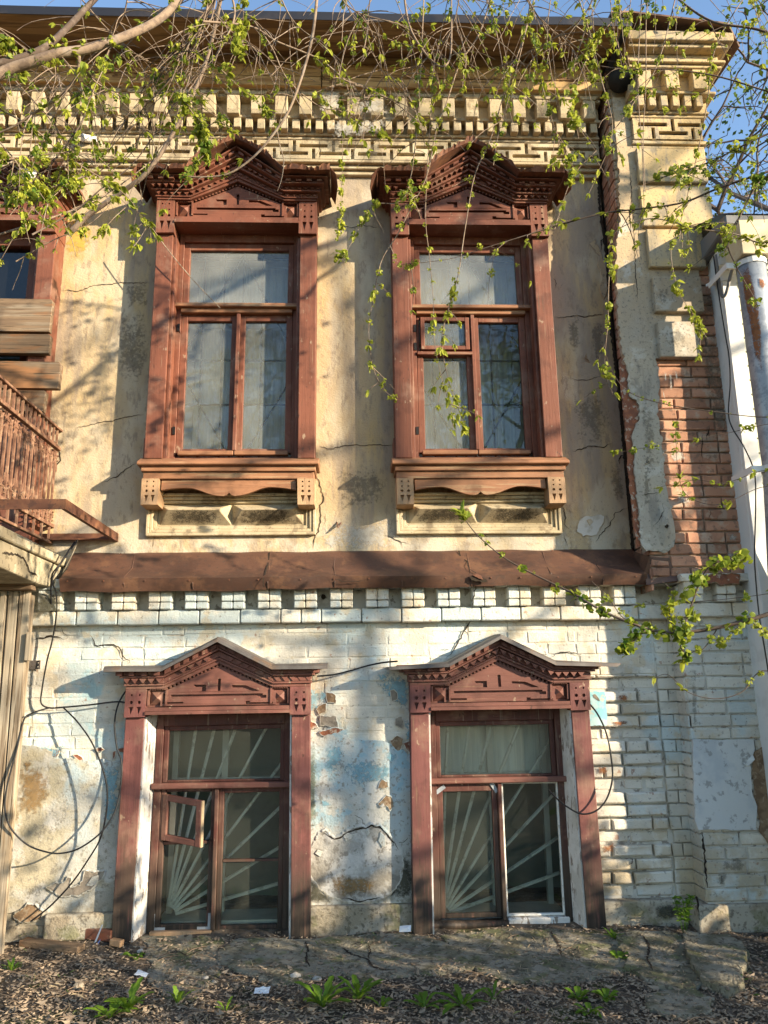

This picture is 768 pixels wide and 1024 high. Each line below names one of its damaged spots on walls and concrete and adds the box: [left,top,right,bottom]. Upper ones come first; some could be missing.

crack [54,414,143,465]
spalling [619,365,641,547]
flaking render [311,692,344,736]
flaking render [390,716,410,753]
flaking render [377,779,394,811]
flaking render [742,747,768,843]
crack [312,804,408,850]
flaking render [46,869,106,898]
flaking render [311,821,405,904]
crack [695,834,708,913]
flaking render [12,902,45,924]